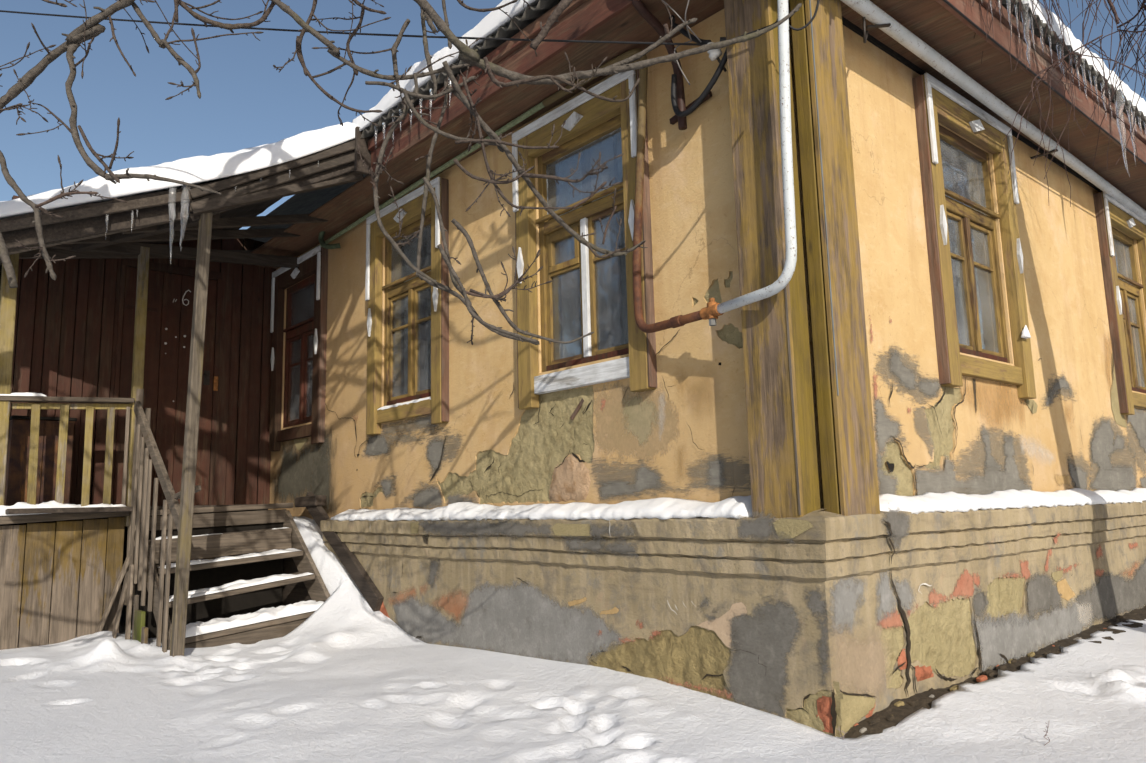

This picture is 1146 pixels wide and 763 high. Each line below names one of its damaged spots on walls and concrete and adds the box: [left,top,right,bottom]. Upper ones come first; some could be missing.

flaking render [693,271,733,305]
flaking render [716,323,743,348]
flaking render [1025,399,1037,414]
flaking render [437,382,678,504]
flaking render [881,440,913,496]
flaking render [360,487,384,508]
crack [883,519,1008,697]
flaking render [986,576,1025,618]
flaking render [588,626,736,702]
flaking render [880,597,1004,689]
flaking render [786,681,876,737]
crack [831,690,877,736]